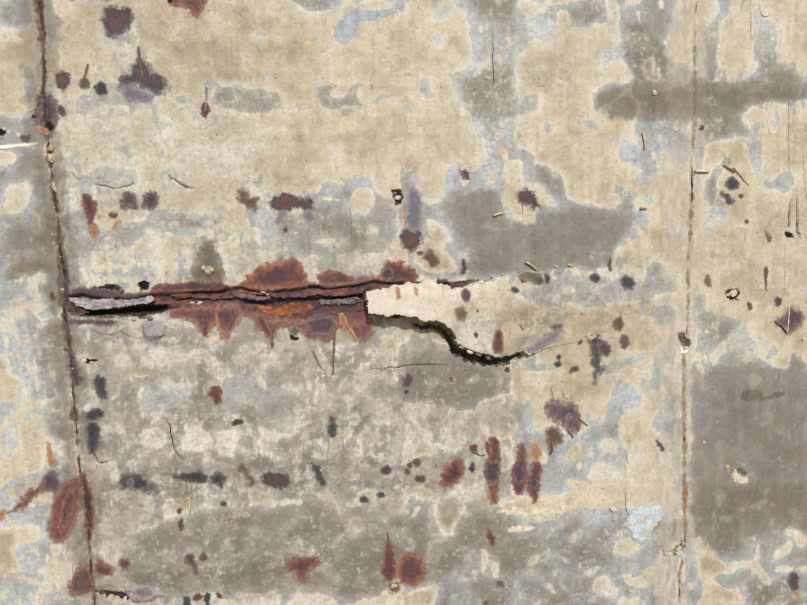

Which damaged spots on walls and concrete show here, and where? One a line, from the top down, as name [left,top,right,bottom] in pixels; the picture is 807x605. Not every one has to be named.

rust [170,303,241,340]
crack [66,275,420,339]
rust [241,257,353,292]
crack [447,279,479,289]
peeling [366,264,625,360]
rust [774,289,806,335]
damp [740,389,785,401]
rust [0,442,96,544]
rust [469,436,502,504]
rust [511,387,588,504]
rust [381,532,427,587]
crack [94,589,135,603]